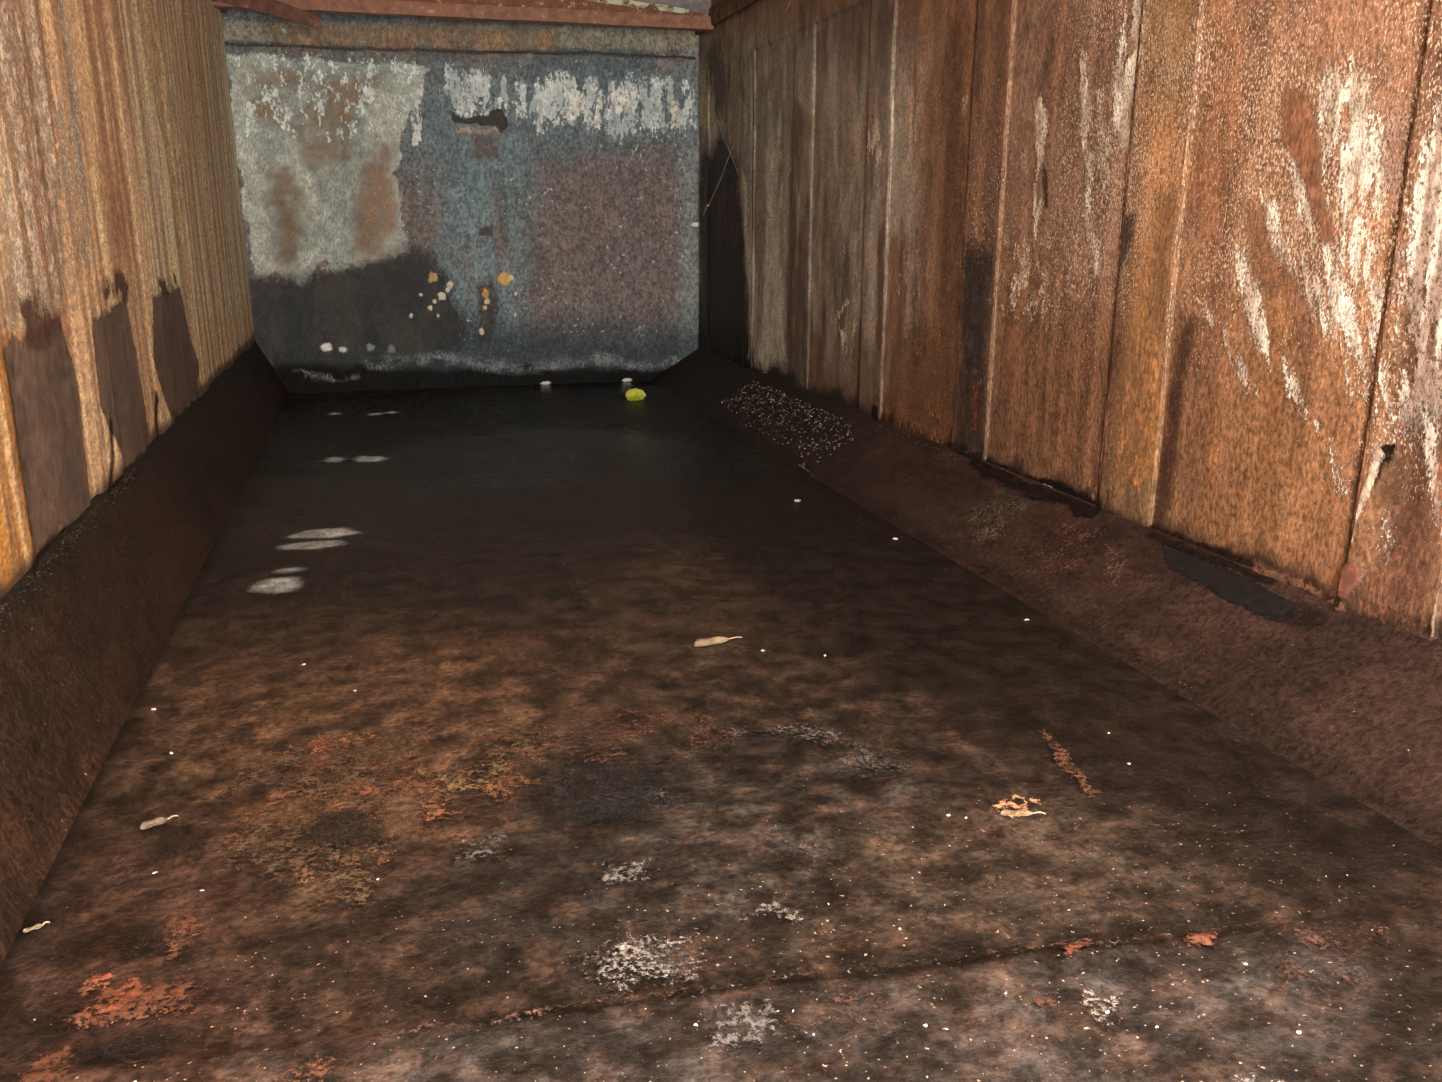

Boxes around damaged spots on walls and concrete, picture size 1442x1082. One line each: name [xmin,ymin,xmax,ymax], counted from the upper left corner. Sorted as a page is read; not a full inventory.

peeling [226,48,430,287]
spalling [452,107,509,158]
spalling [478,225,493,237]
damp [697,30,920,397]
damp [1078,0,1146,278]
damp [1154,242,1351,527]
damp [1259,159,1442,543]
corrosion [157,705,742,906]
corrosion [19,973,199,1082]
corrosion [162,904,208,960]
damp [584,932,706,996]
damp [709,998,781,1057]